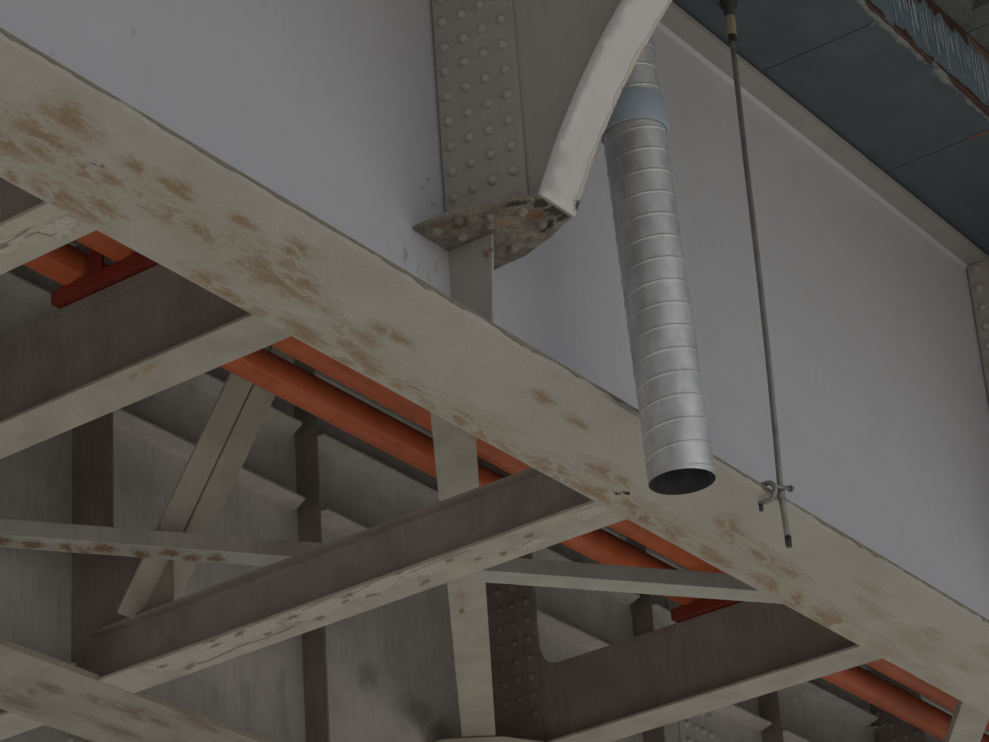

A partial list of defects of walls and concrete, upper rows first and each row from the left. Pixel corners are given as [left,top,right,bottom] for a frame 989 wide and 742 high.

damp [876,0,989,103]
corrosion [0,89,910,670]
corrosion [0,680,179,742]
corrosion [909,662,965,699]